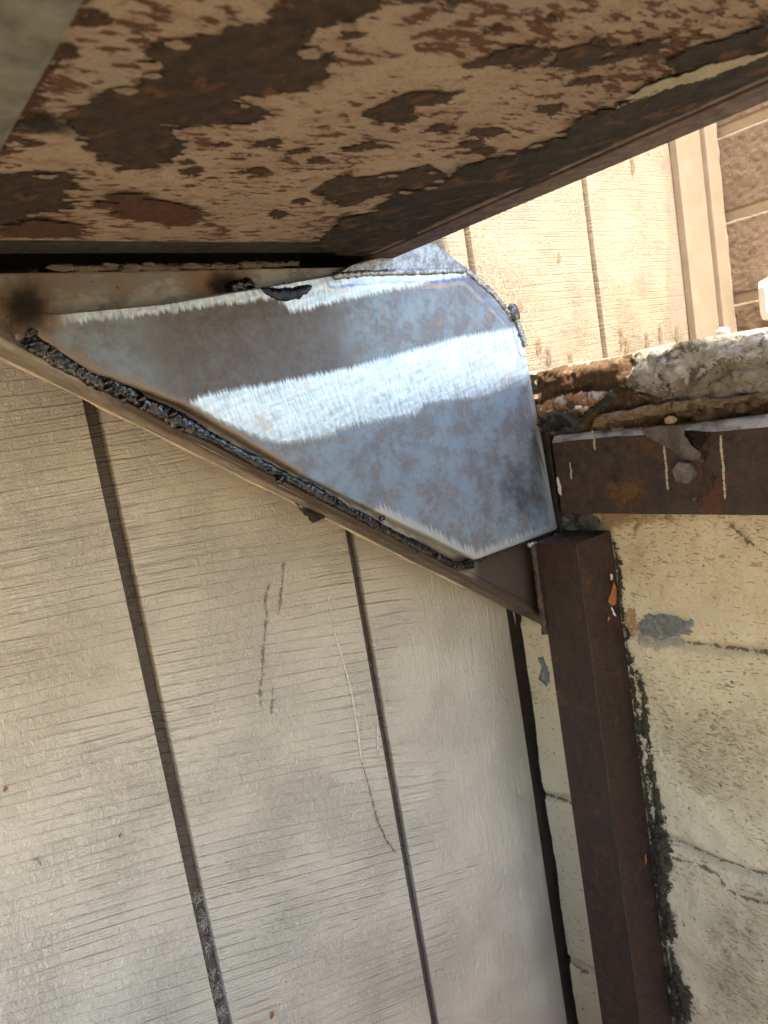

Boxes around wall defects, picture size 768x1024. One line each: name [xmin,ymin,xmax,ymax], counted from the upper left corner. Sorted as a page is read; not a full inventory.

rust [56,0,474,180]
peeling [617,52,768,108]
rust [0,42,217,229]
rust [268,15,768,257]
spalling [536,328,768,417]
rust [607,582,617,622]
crack [362,764,395,852]